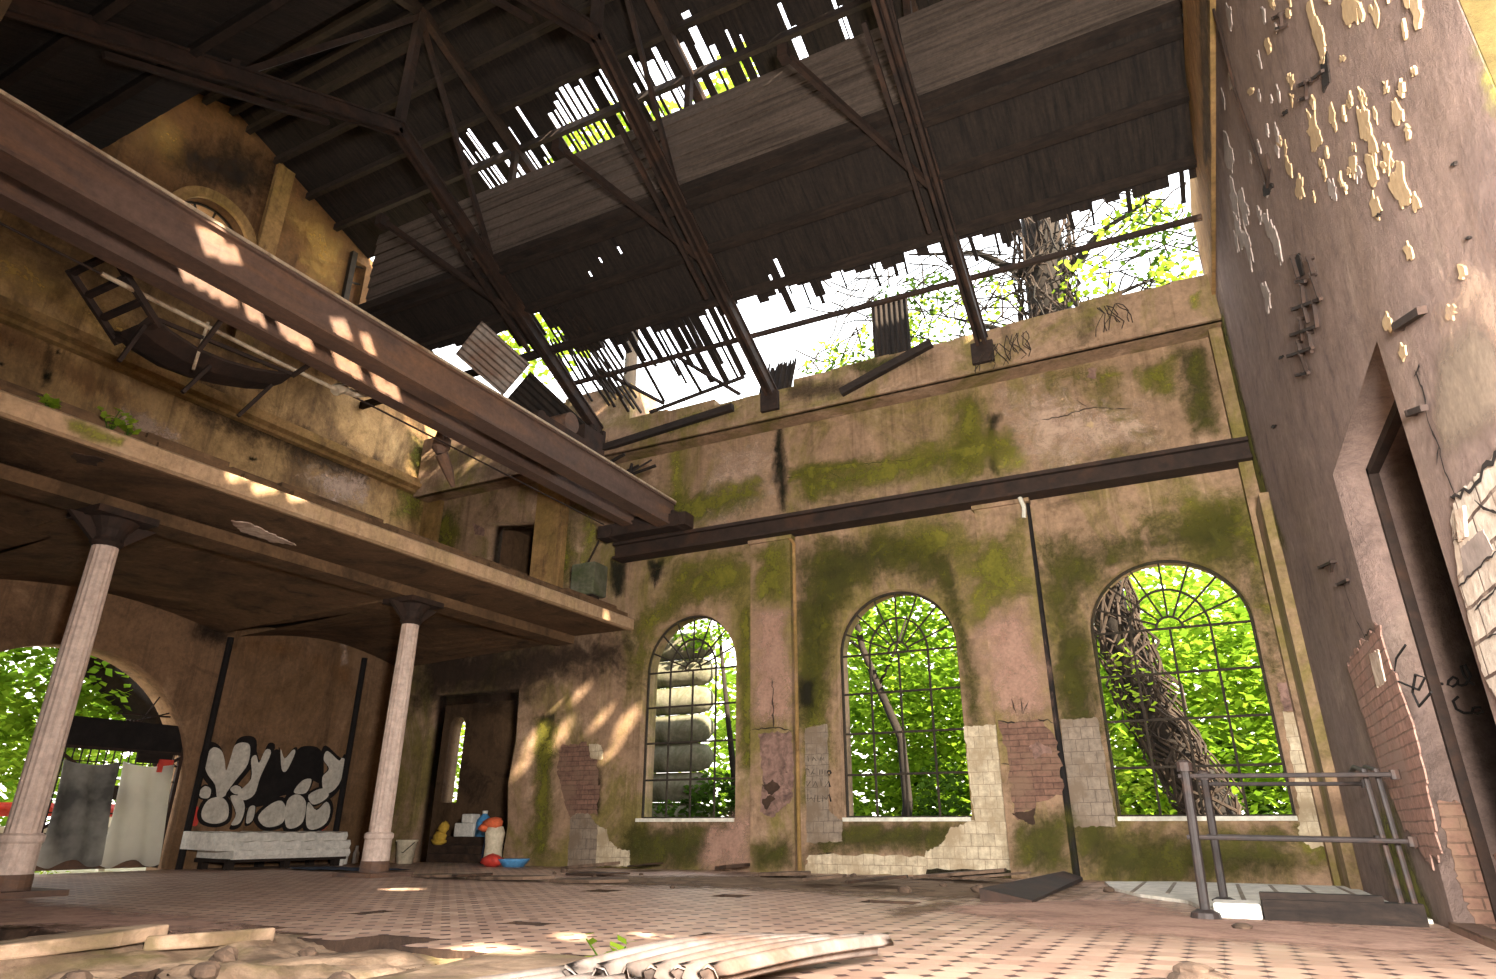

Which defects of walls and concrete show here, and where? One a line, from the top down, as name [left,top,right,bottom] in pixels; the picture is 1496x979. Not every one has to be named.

peeling [1257,0,1424,69]
peeling [1221,65,1422,314]
peeling [1456,264,1468,280]
peeling [1382,311,1408,362]
damp [706,429,860,519]
damp [610,559,625,596]
damp [937,556,978,727]
damp [738,607,750,769]
damp [800,680,813,707]
spalling [557,741,601,817]
spalling [1347,622,1496,930]
damp [624,822,728,869]